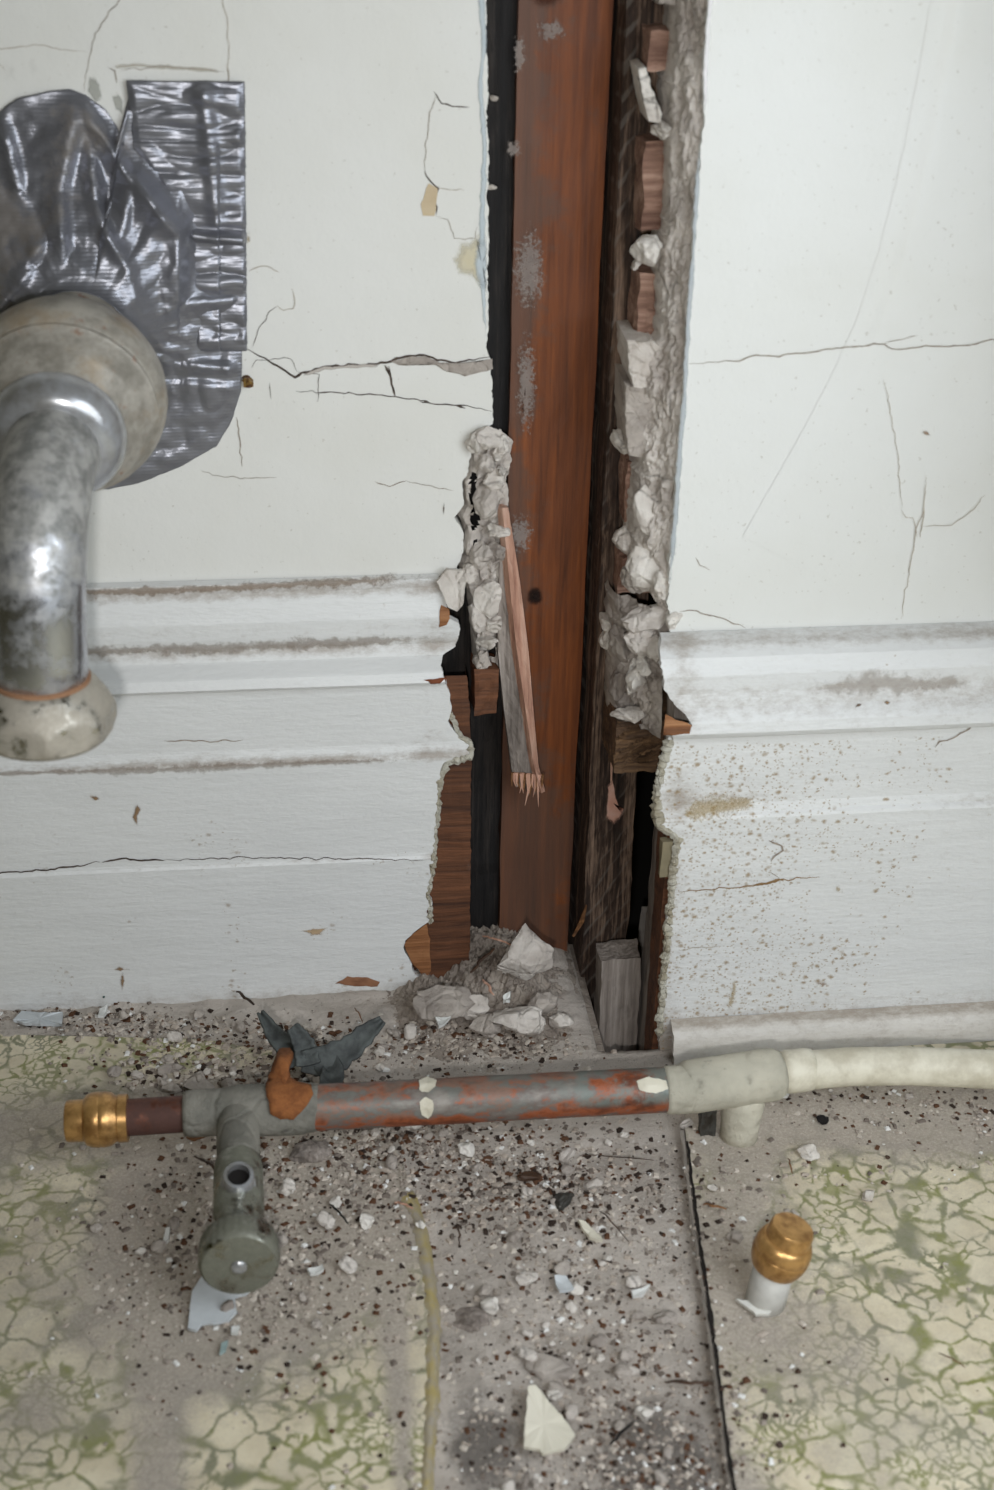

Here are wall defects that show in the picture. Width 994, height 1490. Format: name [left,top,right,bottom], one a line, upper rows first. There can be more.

crack [0,0,120,89]
peeling [421,0,487,324]
crack [247,266,493,412]
spalling [604,0,712,738]
crack [691,335,994,364]
crack [201,418,276,479]
crack [884,384,986,618]
spalling [436,426,513,669]
crack [681,610,745,628]
crack [0,856,419,874]
spalling [404,924,431,975]
peeling [435,1016,451,1028]